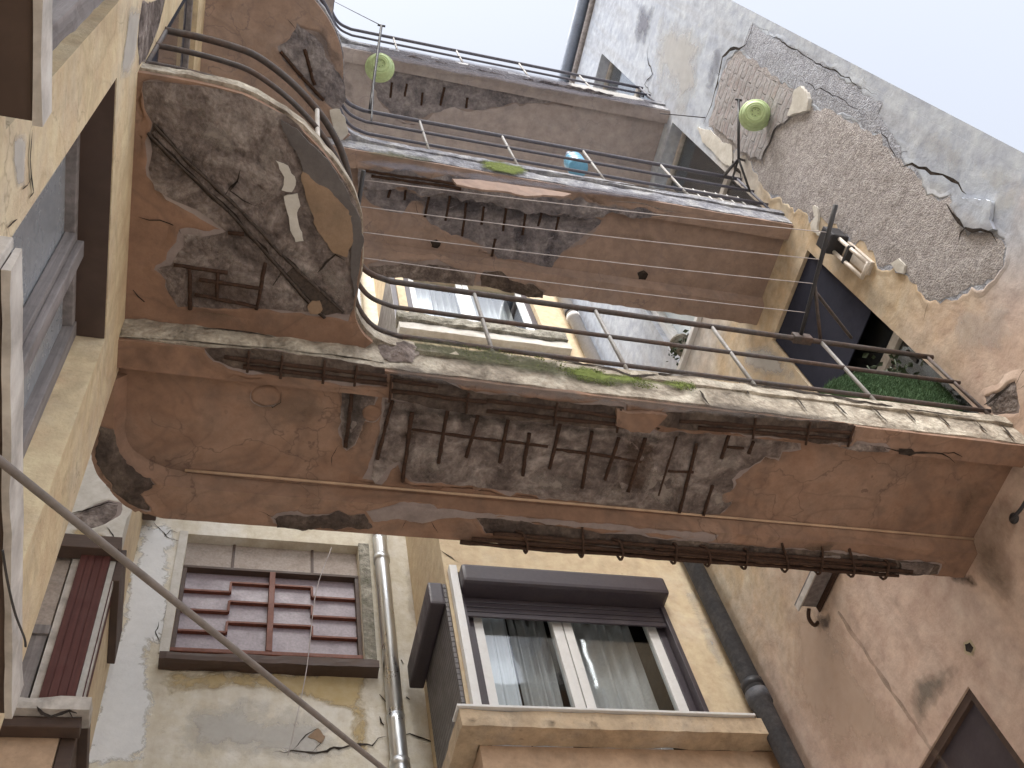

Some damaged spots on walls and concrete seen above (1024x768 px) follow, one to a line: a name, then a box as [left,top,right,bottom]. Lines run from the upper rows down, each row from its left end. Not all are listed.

spalling [698,19,1012,320]
spalling [121,0,895,516]
spalling [979,369,1024,426]
spalling [68,426,162,532]
spalling [260,500,945,580]
leakage [172,673,365,756]
crack [275,694,431,754]